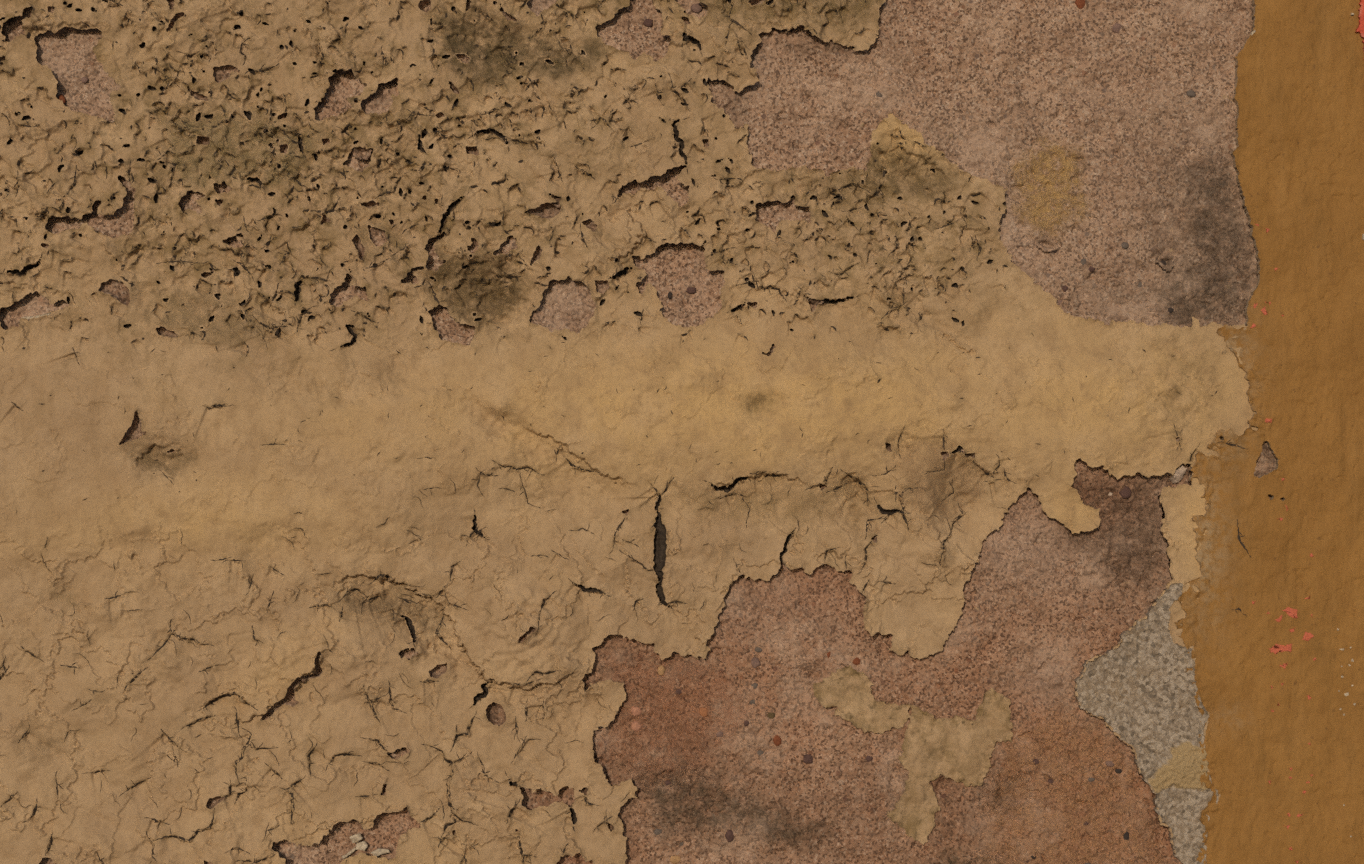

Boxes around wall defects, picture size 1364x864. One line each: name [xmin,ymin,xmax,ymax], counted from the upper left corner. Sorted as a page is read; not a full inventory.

spalling [0,6,164,123]
spalling [279,20,399,121]
spalling [595,0,671,77]
spalling [44,144,174,240]
spalling [178,174,232,214]
spalling [703,0,1258,328]
spalling [401,217,518,284]
spalling [529,165,733,340]
spalling [0,291,70,330]
crack [0,0,1065,864]
spalling [582,458,1219,864]
spalling [272,807,421,864]